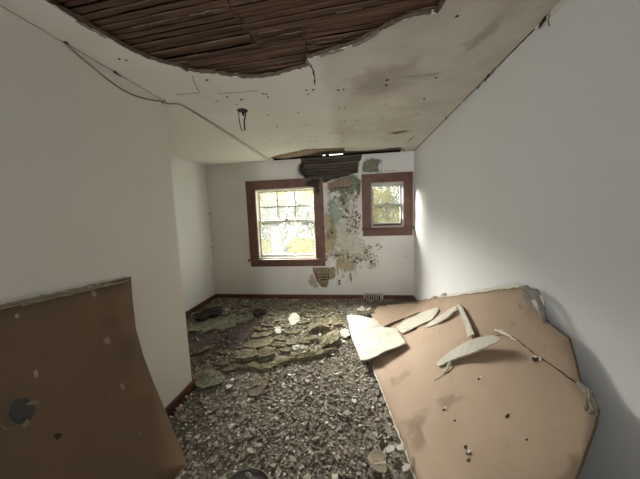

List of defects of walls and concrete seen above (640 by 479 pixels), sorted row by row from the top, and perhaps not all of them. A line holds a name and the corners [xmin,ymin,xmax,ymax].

spalling [46,0,446,79]
damp [362,159,382,172]
peeling [298,154,382,287]